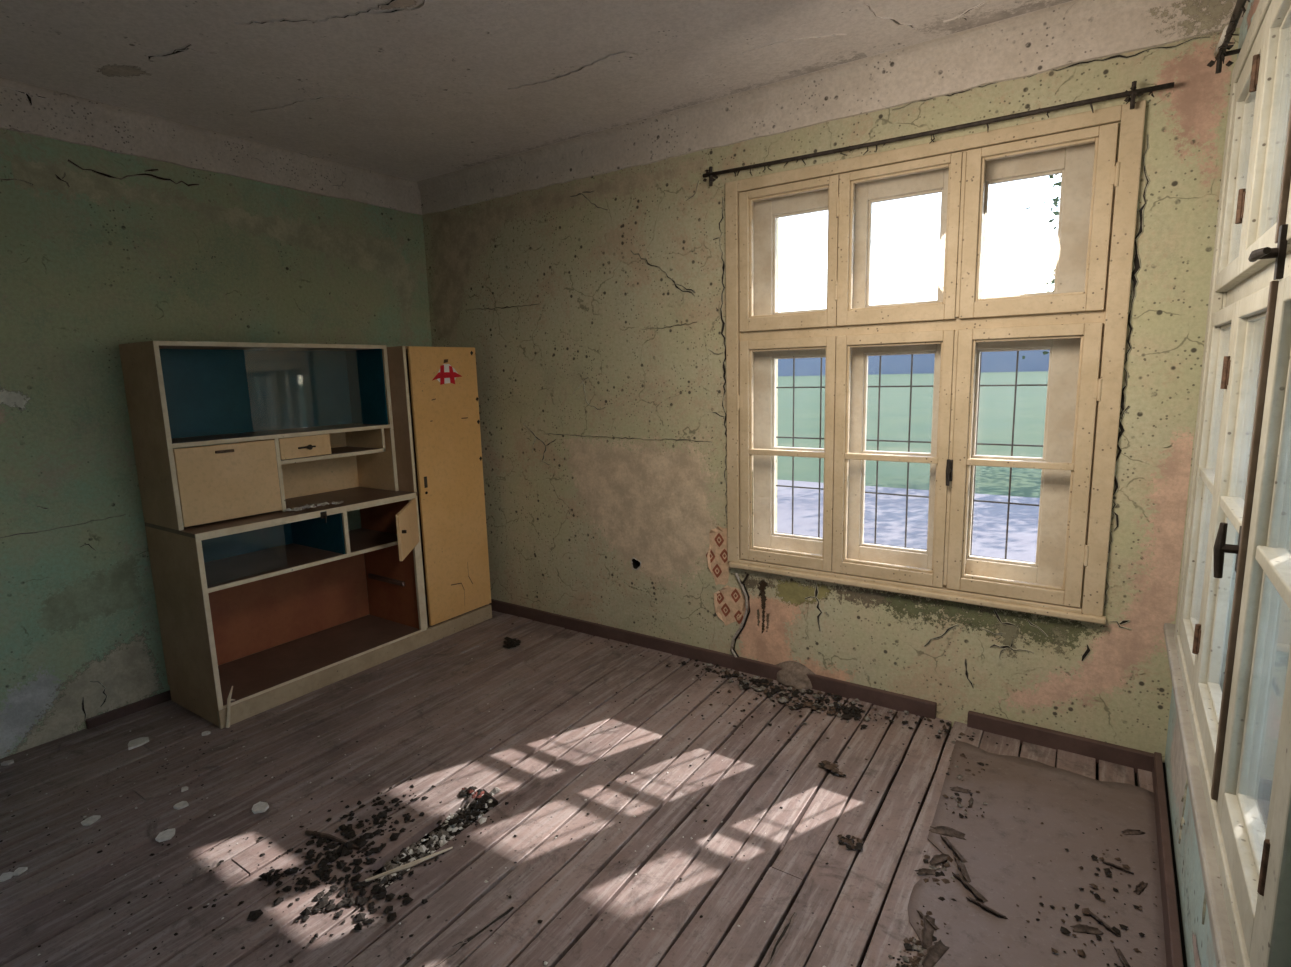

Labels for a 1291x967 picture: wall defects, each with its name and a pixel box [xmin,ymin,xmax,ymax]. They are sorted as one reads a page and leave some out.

crack [234,0,425,25]
crack [864,0,988,30]
crack [147,43,217,60]
crack [0,159,199,188]
crack [523,180,727,524]
crack [1103,134,1151,630]
peeling [0,388,31,411]
peeling [532,403,877,688]
leakage [739,574,1106,659]
crack [924,610,1048,689]
crack [1081,644,1091,661]